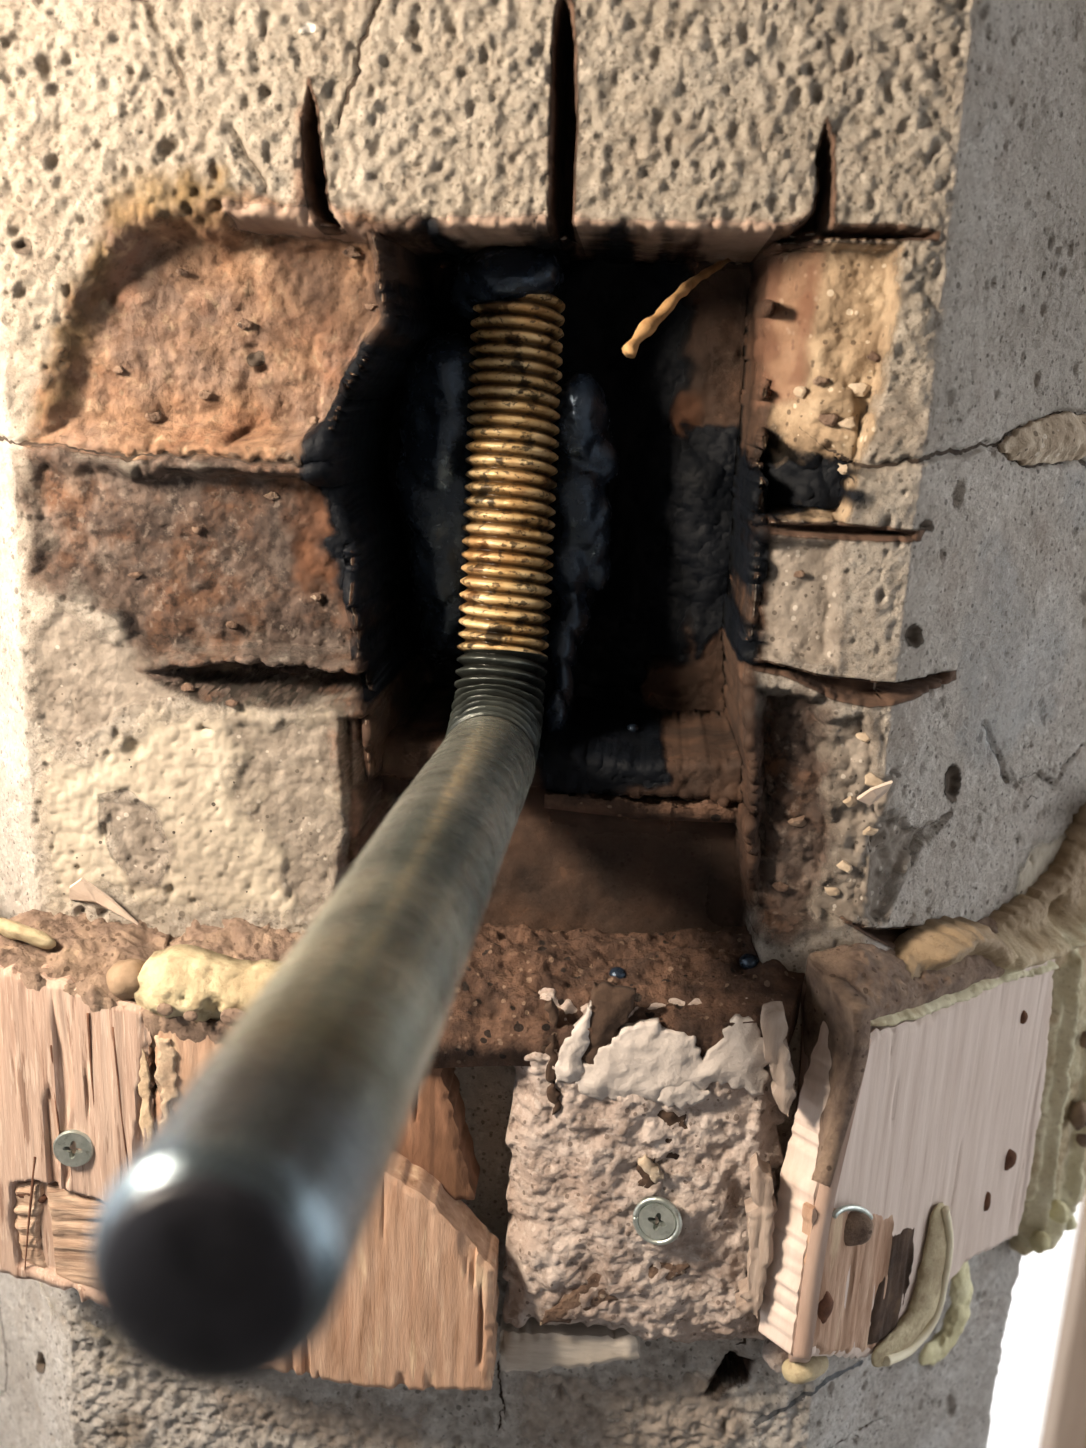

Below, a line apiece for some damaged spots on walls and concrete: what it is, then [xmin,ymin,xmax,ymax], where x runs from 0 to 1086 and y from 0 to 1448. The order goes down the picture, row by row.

crack [132,0,190,97]
crack [337,0,381,129]
crack [232,127,267,192]
crack [0,436,297,466]
spalling [750,239,902,666]
crack [799,411,1086,484]
spalling [19,191,388,925]
spalling [920,519,934,532]
spalling [905,623,924,648]
spalling [746,692,925,944]
peeling [544,982,769,1188]